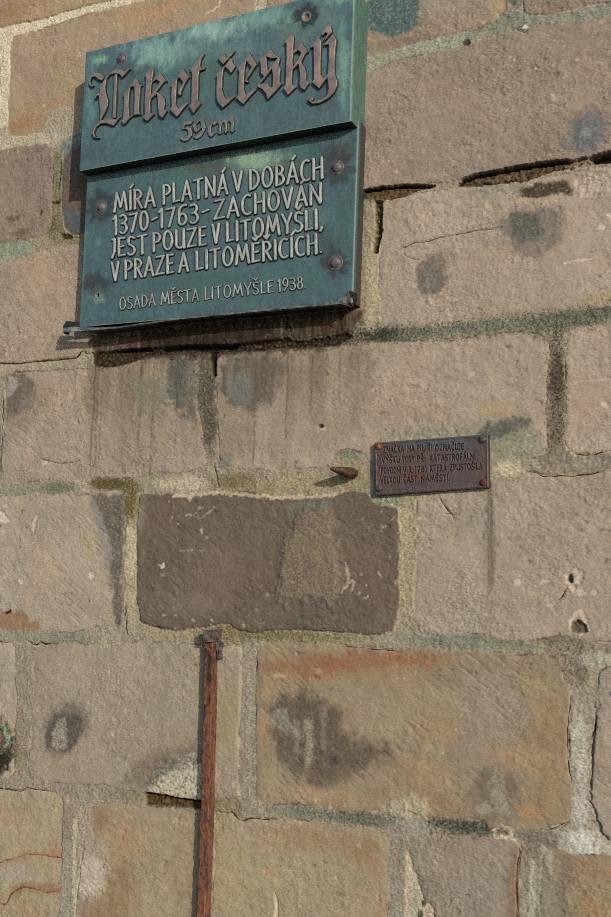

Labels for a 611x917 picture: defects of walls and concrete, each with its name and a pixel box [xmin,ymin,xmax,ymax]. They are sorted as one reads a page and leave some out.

water stain [366,0,428,39]
crack [364,150,611,259]
water stain [475,181,570,263]
water stain [413,237,464,297]
water stain [87,491,130,631]
water stain [40,698,95,762]
water stain [260,681,403,794]
spalling [403,848,437,917]